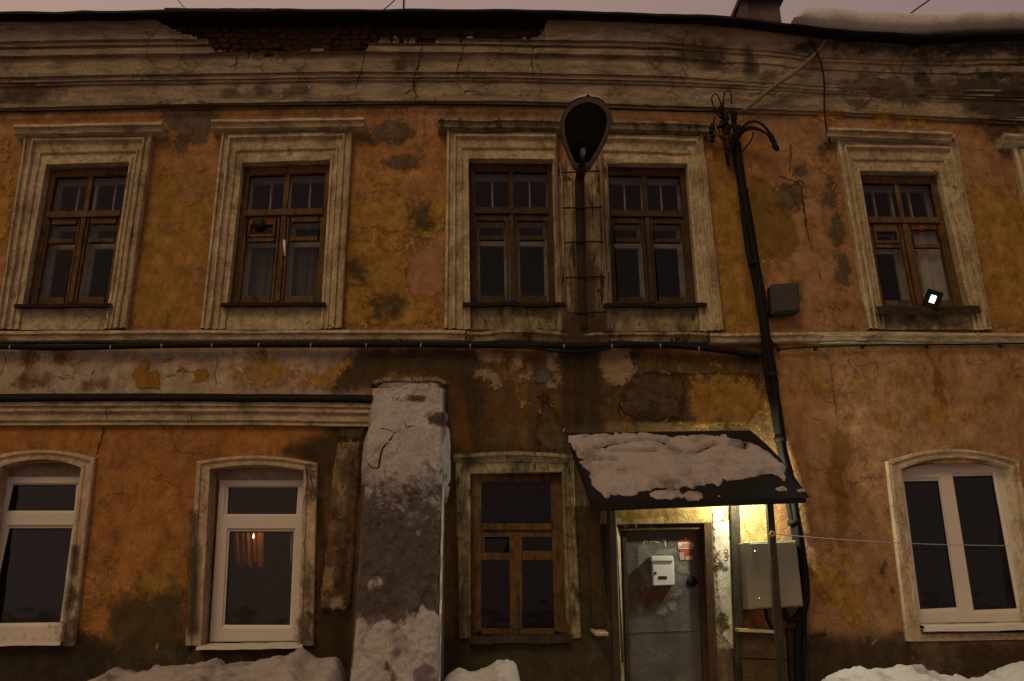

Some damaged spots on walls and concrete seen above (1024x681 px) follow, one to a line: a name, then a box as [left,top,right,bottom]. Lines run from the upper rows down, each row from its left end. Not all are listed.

spalling [170,26,544,58]
crack [405,37,480,111]
water stain [794,38,1024,141]
crack [779,144,813,249]
peeling [131,358,209,388]
peeling [229,348,354,391]
peeling [474,348,561,390]
water stain [0,512,199,681]